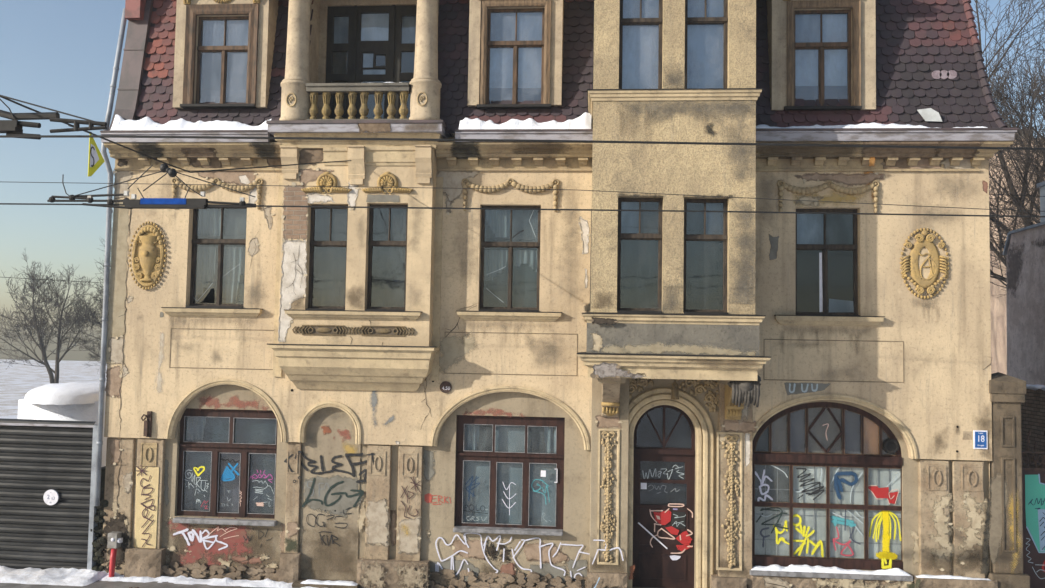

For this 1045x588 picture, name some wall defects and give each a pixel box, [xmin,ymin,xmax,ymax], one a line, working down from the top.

water stain [632,101,753,135]
peeling [347,182,360,210]
peeling [181,148,333,343]
water stain [734,207,756,304]
flaking render [105,335,129,398]
flaking render [590,317,644,378]
flaking render [166,548,199,574]
flaking render [228,521,300,579]
peeling [357,498,422,556]